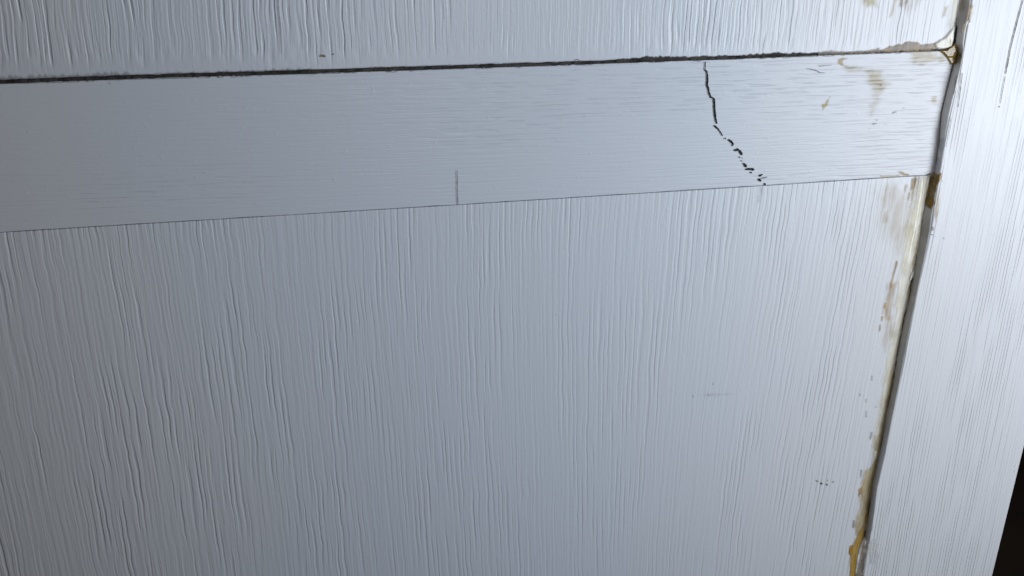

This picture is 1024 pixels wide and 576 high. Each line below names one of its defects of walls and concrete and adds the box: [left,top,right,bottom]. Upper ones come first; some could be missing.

peeling [936,6,973,48]
crack [705,62,767,198]
peeling [874,176,930,461]
peeling [855,528,873,576]